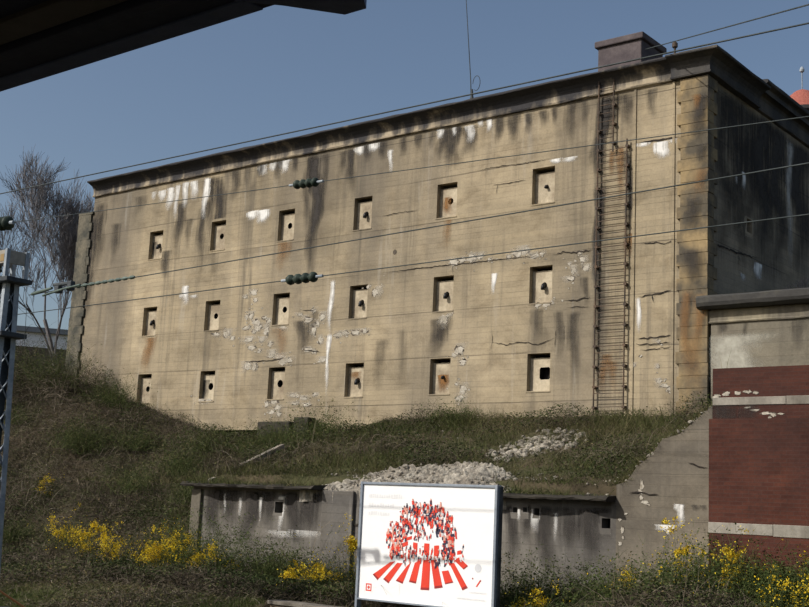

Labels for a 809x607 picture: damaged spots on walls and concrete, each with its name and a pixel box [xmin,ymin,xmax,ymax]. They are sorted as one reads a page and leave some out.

damp [342,142,392,180]
damp [432,113,531,154]
damp [593,95,631,173]
damp [693,94,809,256]
damp [153,178,223,242]
damp [246,209,269,221]
spalling [447,246,547,271]
damp [584,188,605,324]
spalling [211,290,292,371]
spalling [292,306,370,364]
crack [638,335,670,351]
spalling [713,390,759,398]